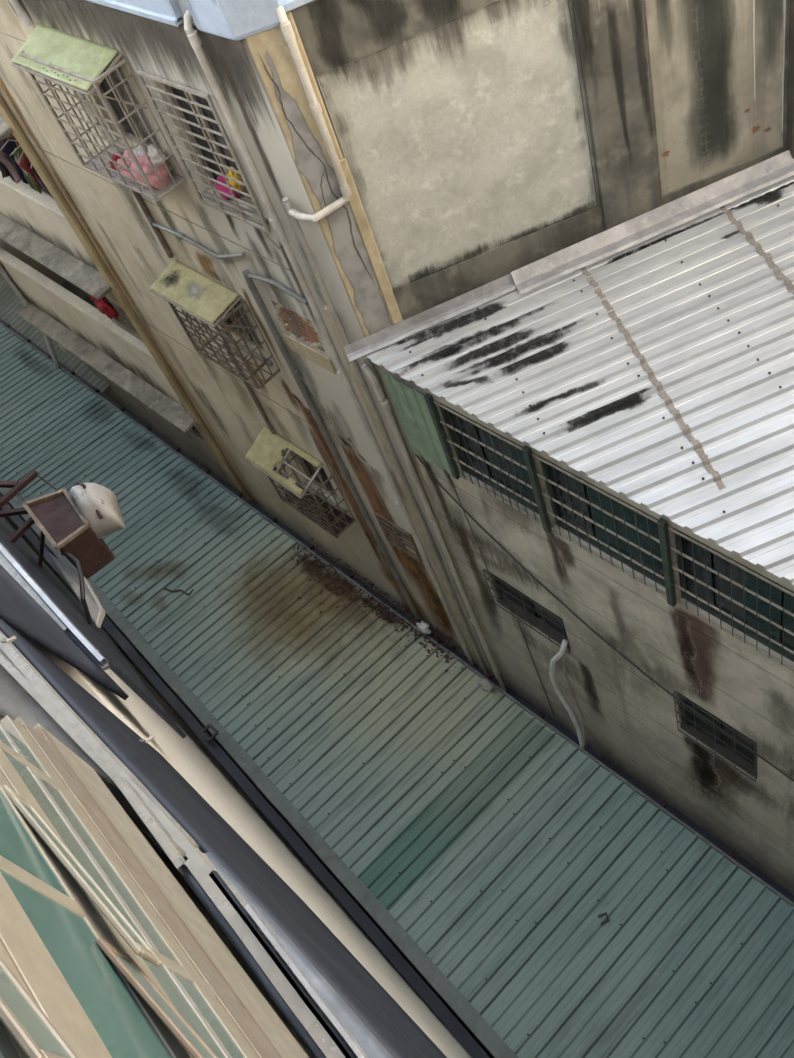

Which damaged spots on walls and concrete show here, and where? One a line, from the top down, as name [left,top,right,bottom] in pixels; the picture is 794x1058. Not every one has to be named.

damp [7,0,289,216]
damp [311,0,411,81]
damp [608,10,629,146]
damp [627,0,650,113]
damp [687,0,737,159]
crack [258,53,375,285]
damp [409,244,489,282]
damp [608,182,794,264]
damp [397,303,576,388]
damp [523,382,599,413]
damp [567,388,650,432]
rust [282,380,453,637]